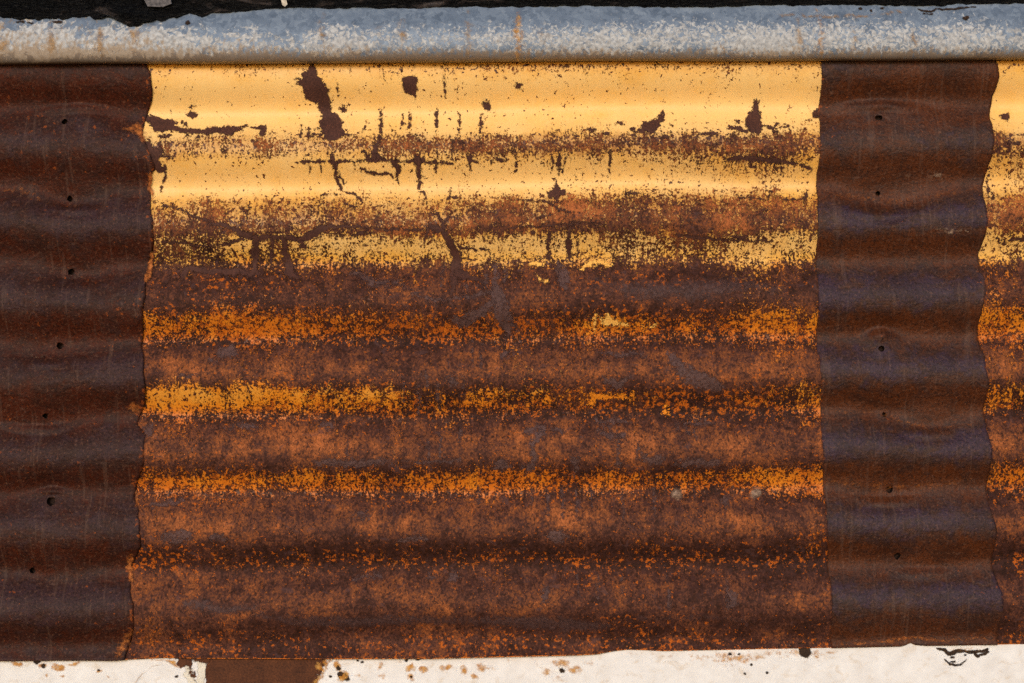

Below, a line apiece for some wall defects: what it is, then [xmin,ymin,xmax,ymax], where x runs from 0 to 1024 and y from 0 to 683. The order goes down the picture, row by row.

corrosion [441,15,762,85]
peeling [145,105,267,193]
peeling [296,64,366,141]
peeling [402,76,418,98]
peeling [478,99,491,133]
peeling [546,153,567,201]
peeling [586,111,674,139]
peeling [699,98,790,137]
peeling [419,187,517,360]
peeling [529,226,613,290]
corrosion [117,64,860,683]
corrosion [978,124,1024,644]